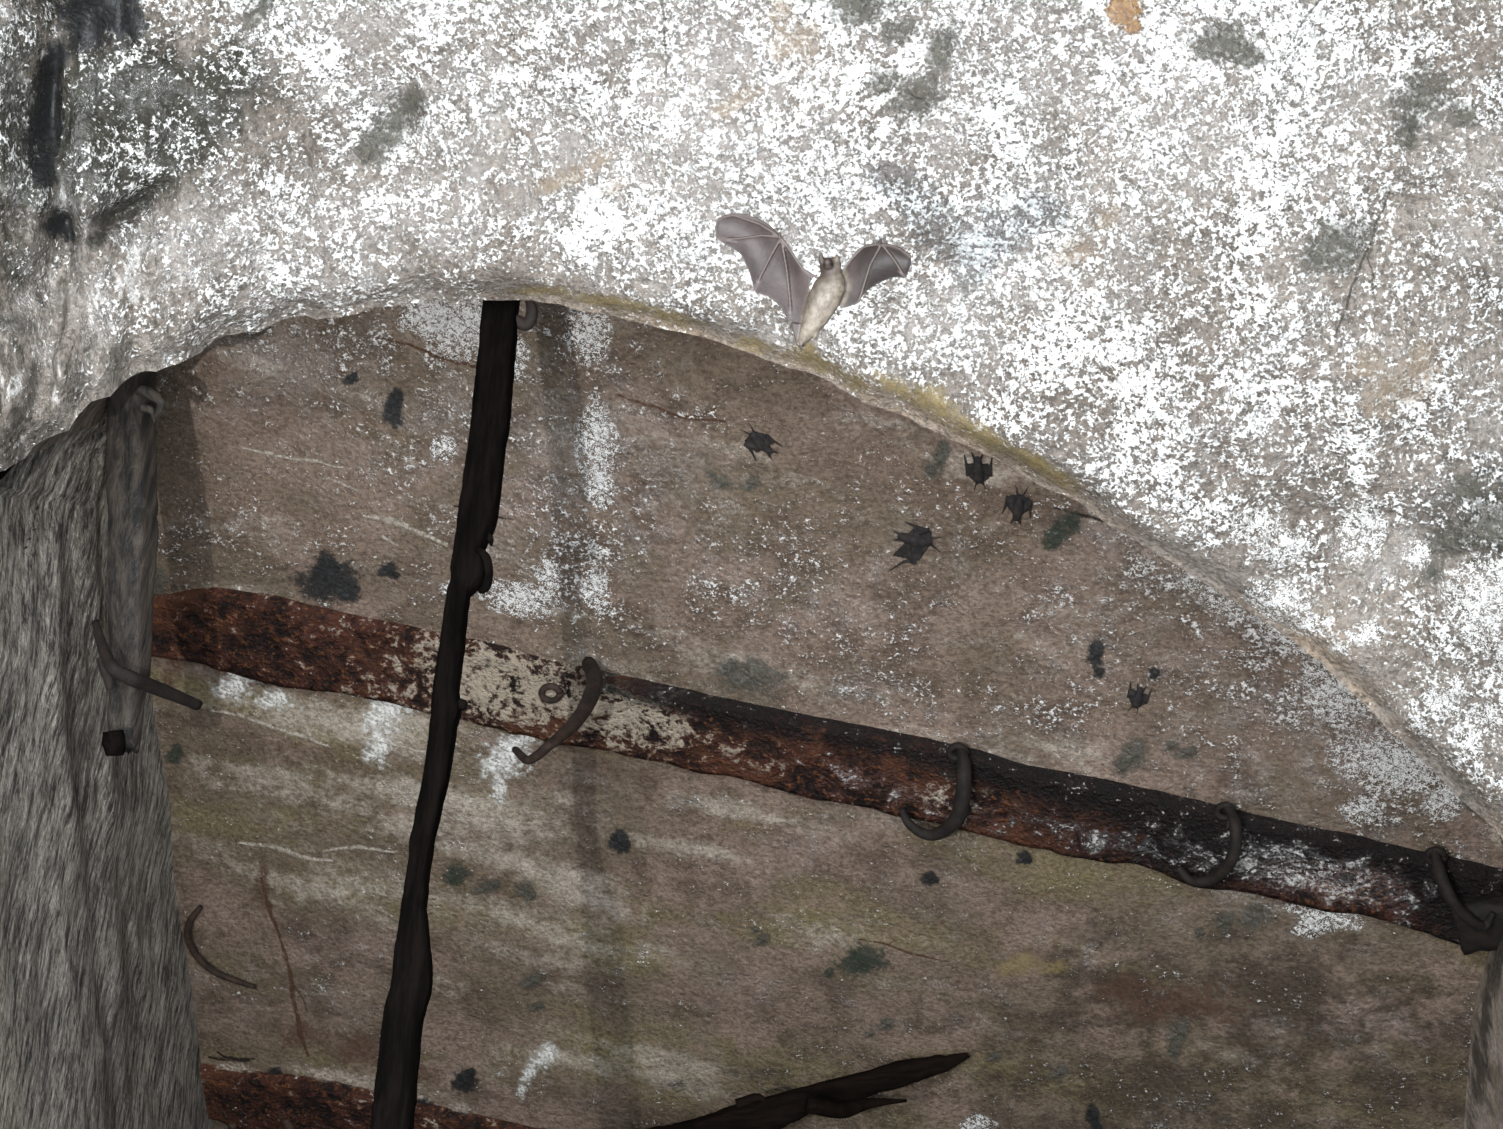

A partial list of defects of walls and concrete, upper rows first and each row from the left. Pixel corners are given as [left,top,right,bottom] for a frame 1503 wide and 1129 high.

water stain [22,0,150,57]
corrosion [1105,0,1143,34]
crack [1334,192,1389,338]
crack [375,337,476,368]
crack [617,394,726,422]
crack [1053,507,1117,532]
water stain [1175,474,1503,825]